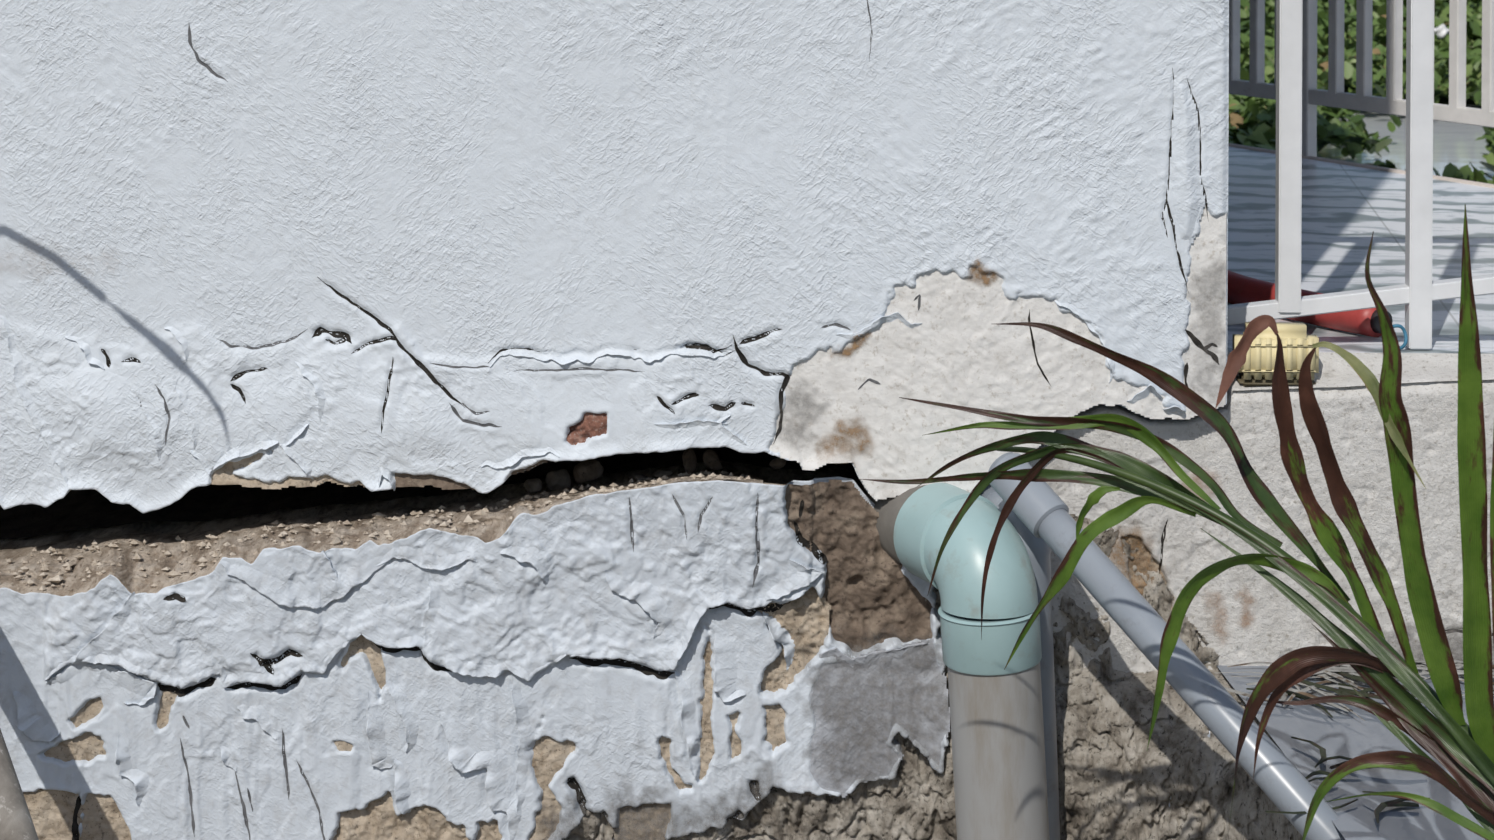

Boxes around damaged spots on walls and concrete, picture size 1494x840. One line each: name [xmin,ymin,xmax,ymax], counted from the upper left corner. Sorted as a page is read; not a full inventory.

crack [188,25,228,82]
crack [866,1,874,57]
crack [1161,68,1209,290]
crack [0,277,857,617]
flaking render [0,206,1226,840]
crack [570,656,675,680]
crack [858,378,880,390]
peeling [1070,514,1284,754]
peeling [1052,596,1303,840]